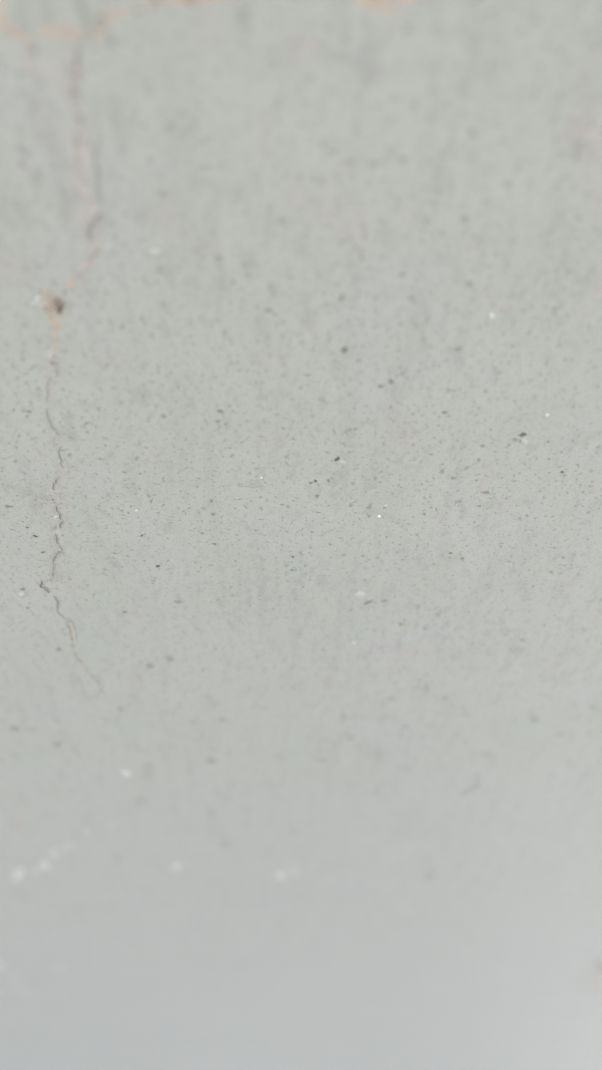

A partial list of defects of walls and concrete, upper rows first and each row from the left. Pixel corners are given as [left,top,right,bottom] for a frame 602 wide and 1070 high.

crack [63,38,115,294]
crack [38,335,103,697]